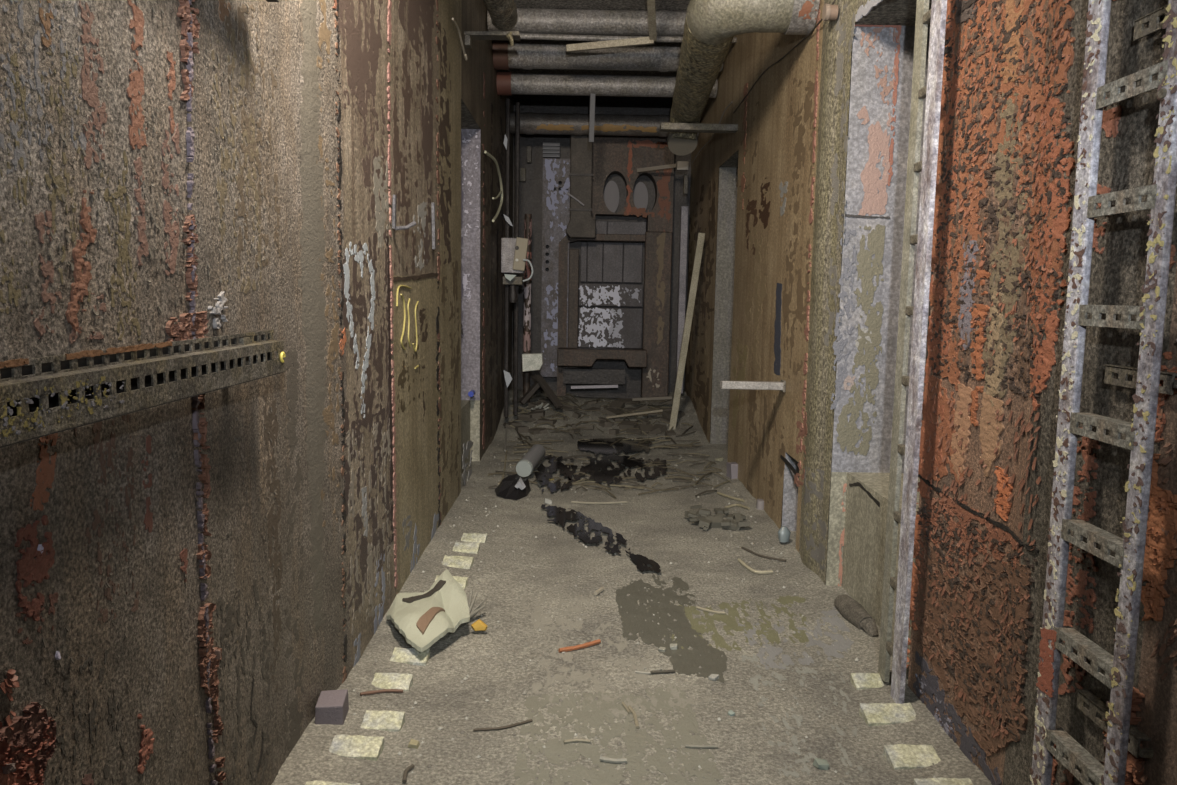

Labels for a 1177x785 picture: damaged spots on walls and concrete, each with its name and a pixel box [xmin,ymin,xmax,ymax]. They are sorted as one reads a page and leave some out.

peeling [855,0,900,216]
peeling [523,219,641,371]
rust [922,375,964,484]
leakage [512,574,868,785]